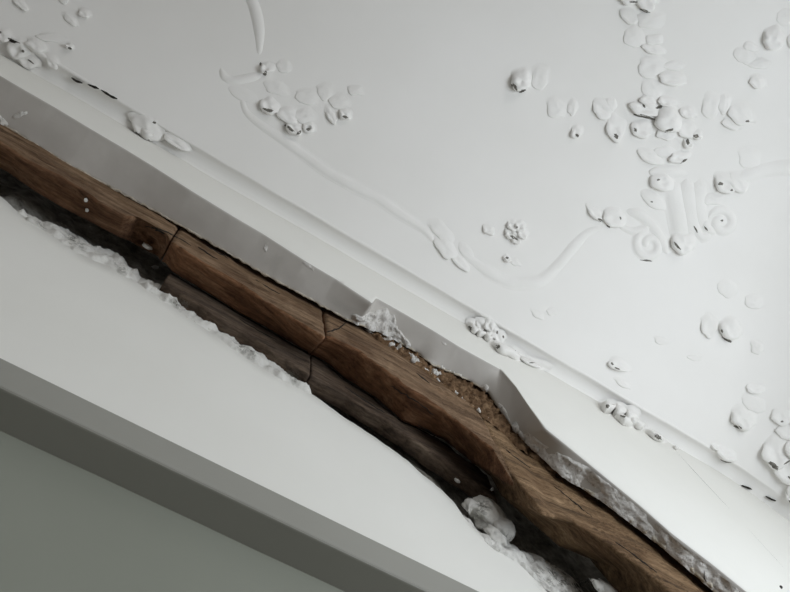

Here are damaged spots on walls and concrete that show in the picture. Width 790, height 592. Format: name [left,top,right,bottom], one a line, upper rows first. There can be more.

spalling [0,111,742,592]